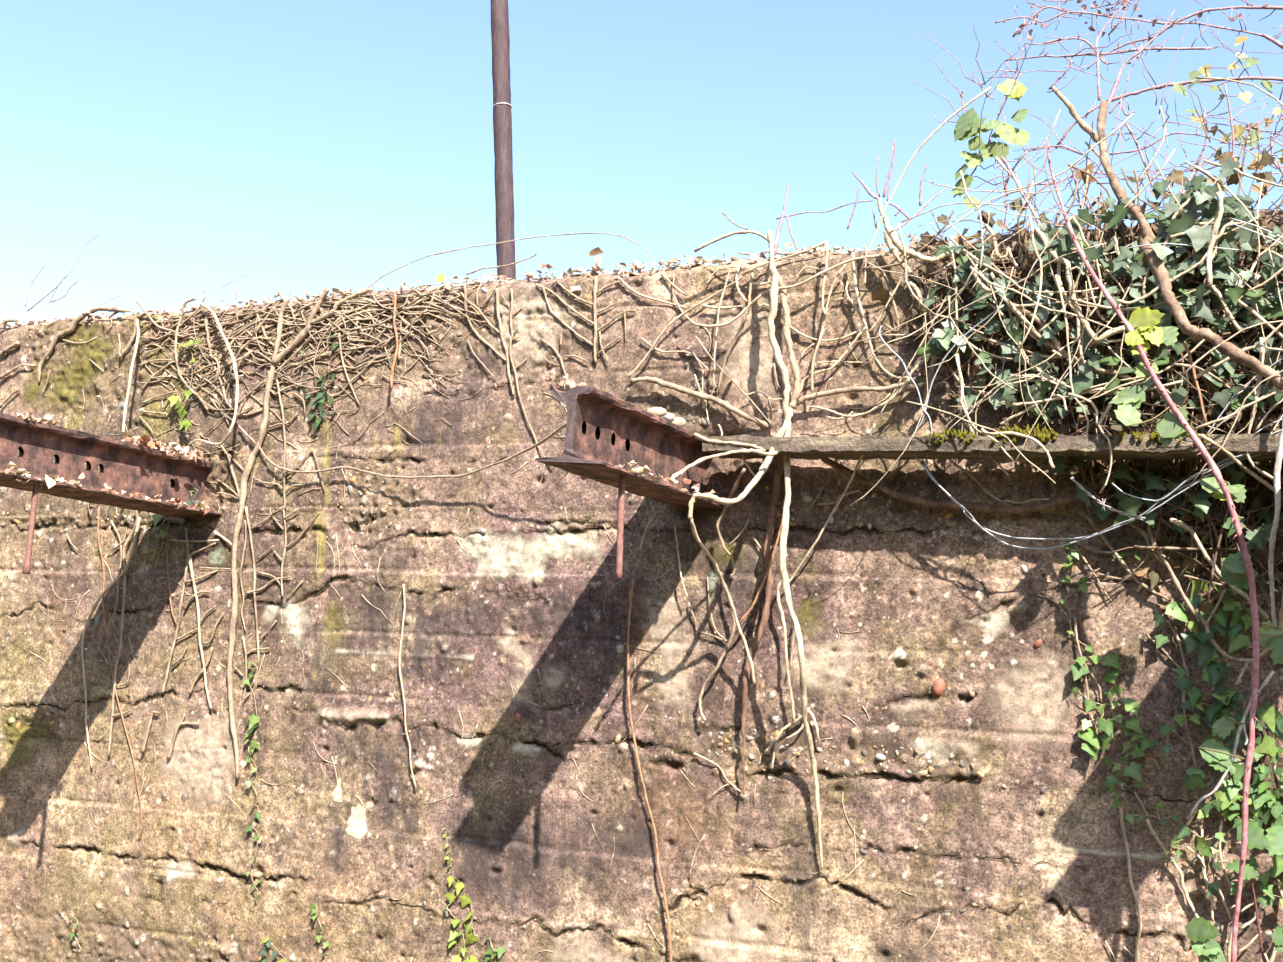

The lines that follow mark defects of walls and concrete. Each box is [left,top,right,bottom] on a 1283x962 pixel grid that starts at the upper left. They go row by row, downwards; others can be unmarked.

crack [8,835,1192,962]